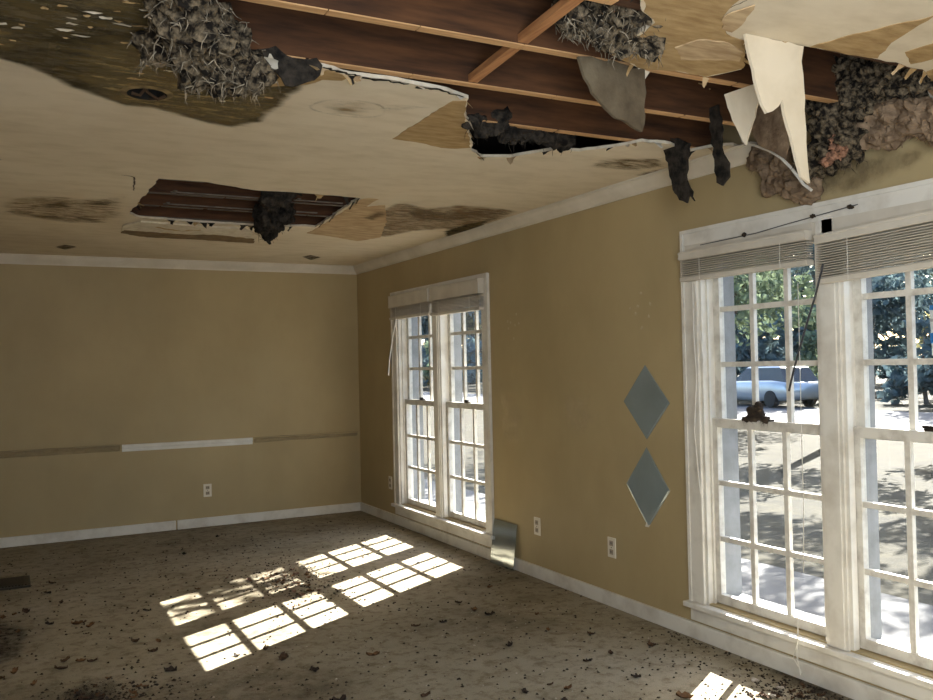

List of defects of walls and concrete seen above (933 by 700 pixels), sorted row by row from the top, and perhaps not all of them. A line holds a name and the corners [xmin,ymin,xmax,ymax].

leakage [0,0,299,126]
spalling [310,65,471,106]
spalling [891,64,927,84]